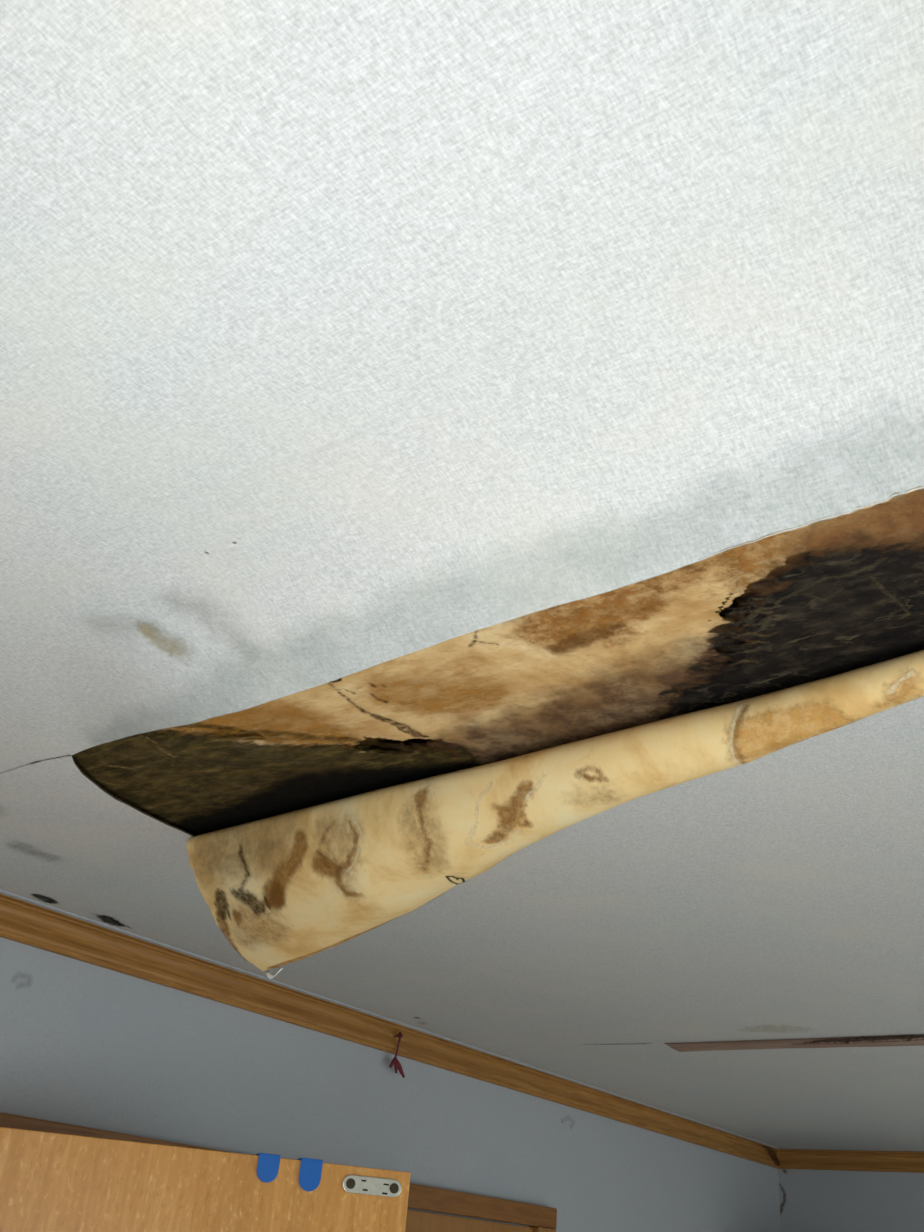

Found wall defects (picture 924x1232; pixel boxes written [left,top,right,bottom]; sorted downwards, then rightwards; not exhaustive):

water stain [72,537,924,836]
water stain [468,780,542,849]
water stain [32,894,57,904]
water stain [95,914,129,928]